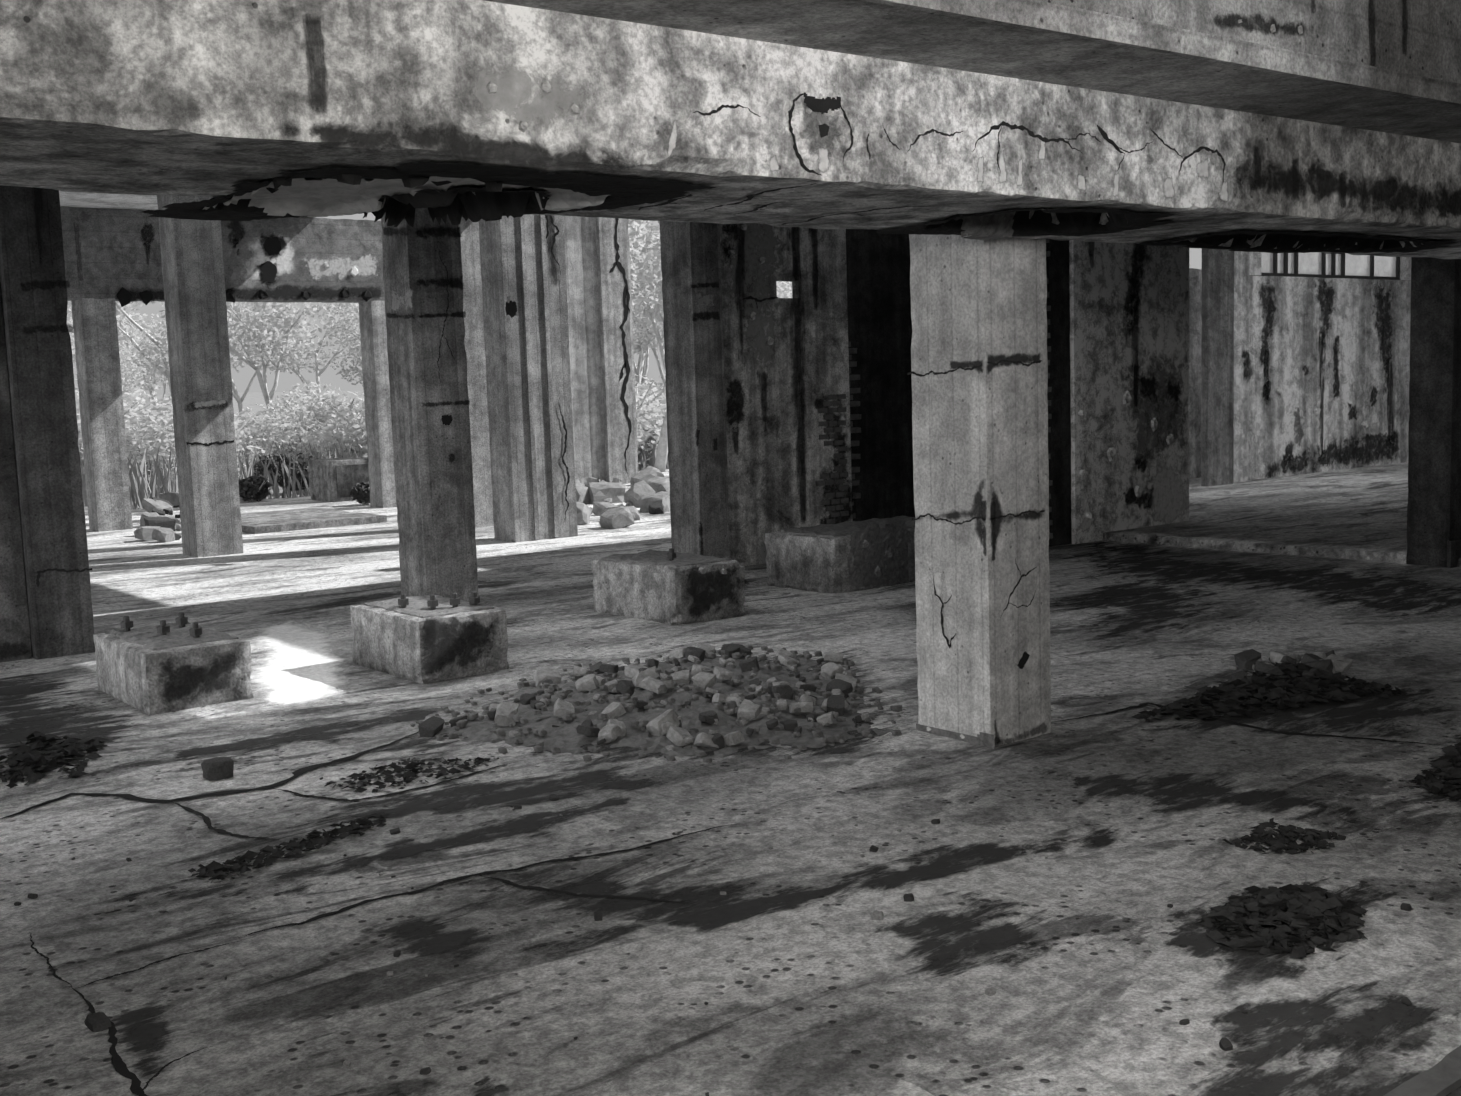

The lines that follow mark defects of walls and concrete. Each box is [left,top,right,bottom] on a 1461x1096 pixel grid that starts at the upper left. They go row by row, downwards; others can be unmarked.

crack [692,104,760,117]
spalling [788,92,854,175]
spalling [142,162,716,227]
crack [609,183,946,474]
leakage [1123,243,1147,406]
leakage [1258,280,1276,405]
leakage [1266,279,1400,478]
crack [931,572,956,648]
crack [1001,559,1037,616]
crack [30,823,739,1096]
leakage [1165,883,1306,978]
leakage [1189,982,1439,1096]